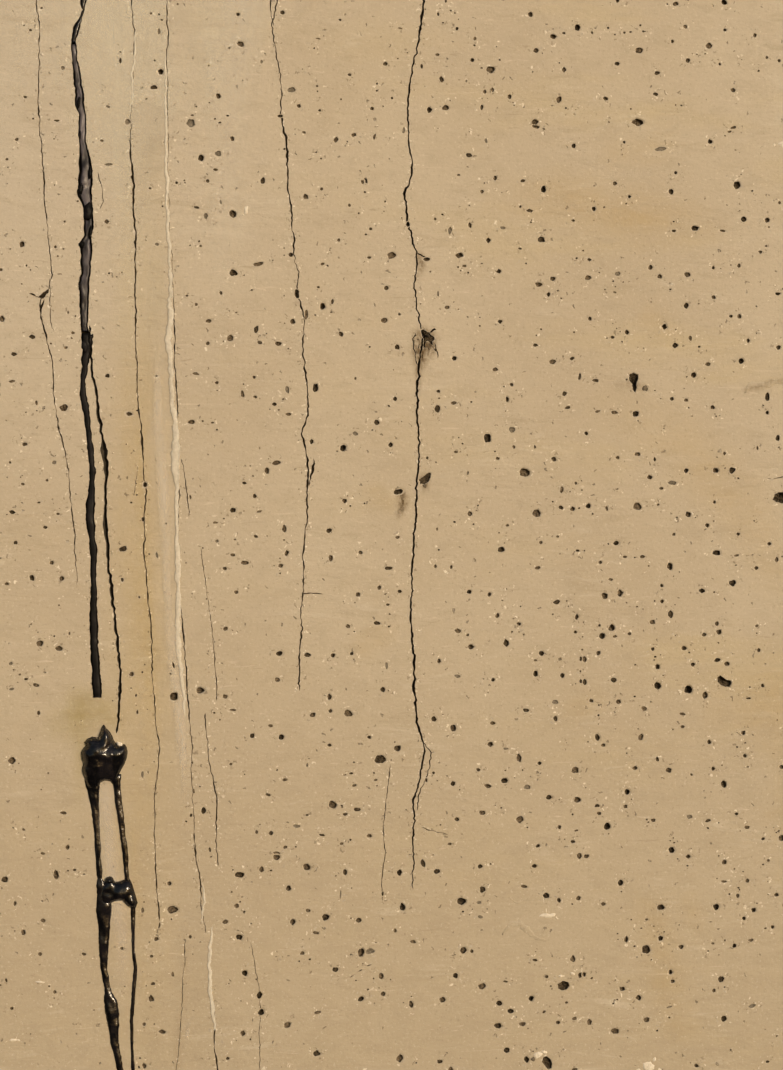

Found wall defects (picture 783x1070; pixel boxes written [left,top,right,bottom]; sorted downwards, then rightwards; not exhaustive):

crack [29,0,122,733]
crack [129,0,160,921]
crack [166,0,179,420]
efflorescence [164,55,186,715]
crack [178,459,190,534]
crack [176,550,219,1070]
damp [201,883,216,1030]
crack [270,0,321,691]
crack [381,0,448,900]